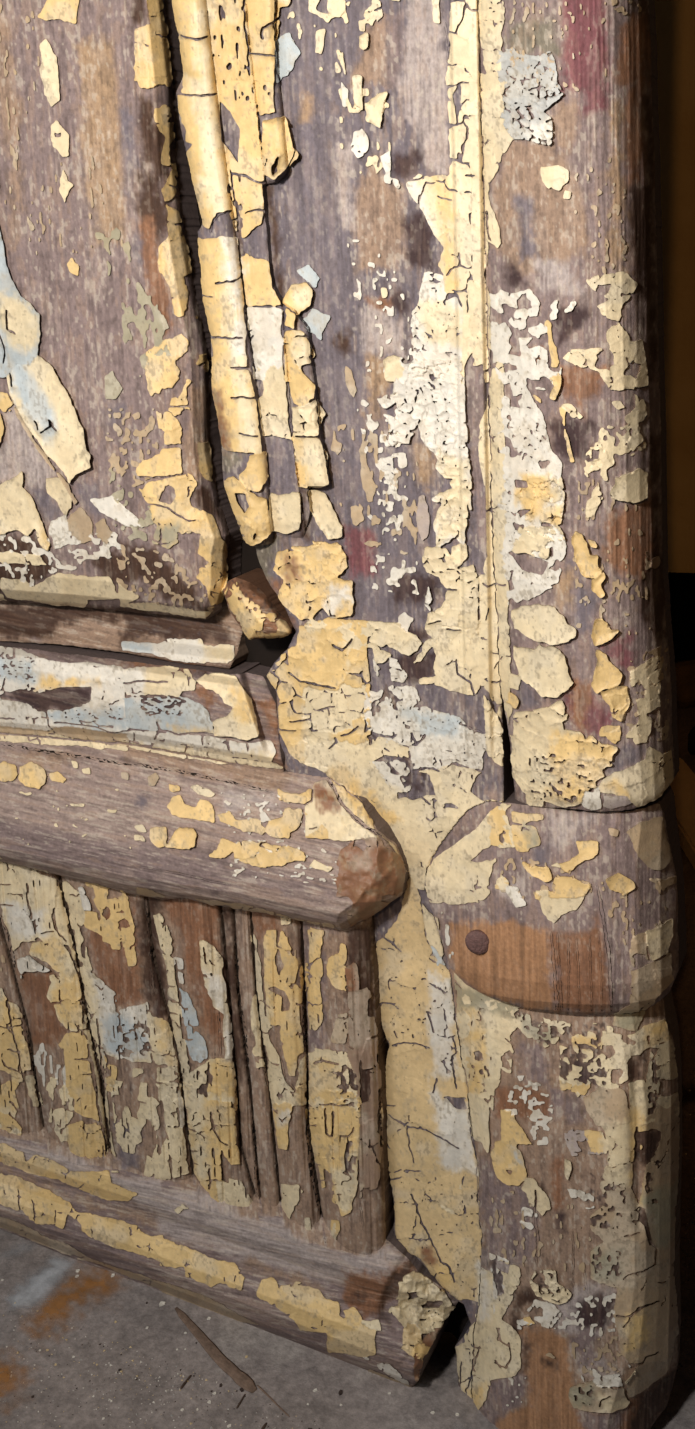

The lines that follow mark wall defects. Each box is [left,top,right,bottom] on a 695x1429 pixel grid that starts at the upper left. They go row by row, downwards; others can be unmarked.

peeling [4,0,131,276]
peeling [134,0,173,89]
peeling [0,232,292,640]
peeling [0,760,90,843]
peeling [0,638,283,769]
peeling [134,824,197,849]
peeling [154,0,680,1413]
peeling [0,857,258,1325]